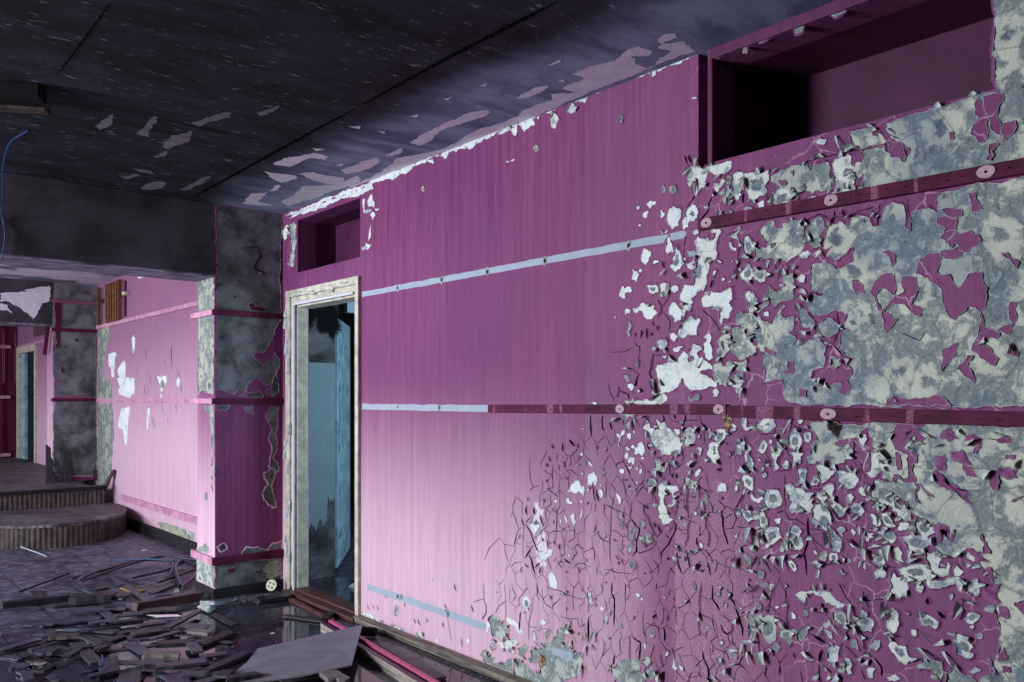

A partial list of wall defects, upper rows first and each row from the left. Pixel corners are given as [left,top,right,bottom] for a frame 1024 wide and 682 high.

spalling [197,88,610,518]
peeling [554,0,1024,682]
peeling [156,375,180,398]
crack [354,295,897,682]
spalling [157,521,290,589]
peeling [522,595,531,612]
peeling [529,519,540,538]
peeling [538,547,564,597]
peeling [480,612,596,682]